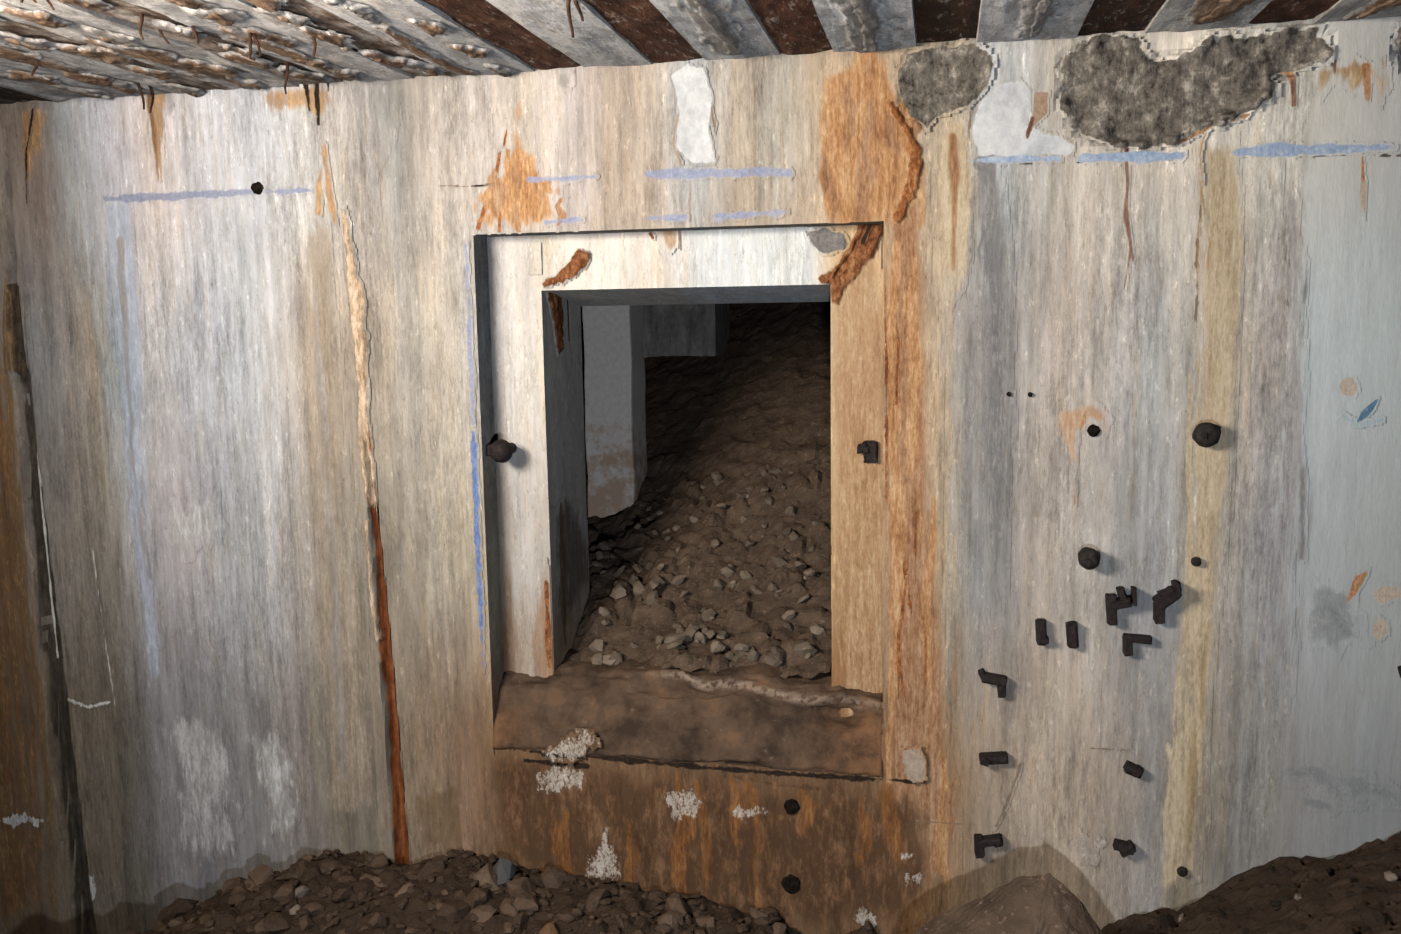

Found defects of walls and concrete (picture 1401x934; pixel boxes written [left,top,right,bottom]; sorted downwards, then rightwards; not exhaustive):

corrosion [0,0,517,211]
corrosion [470,92,578,275]
spalling [894,24,1335,158]
corrosion [0,192,65,934]
corrosion [526,556,553,678]
corrosion [813,50,965,888]
leakage [404,728,942,934]